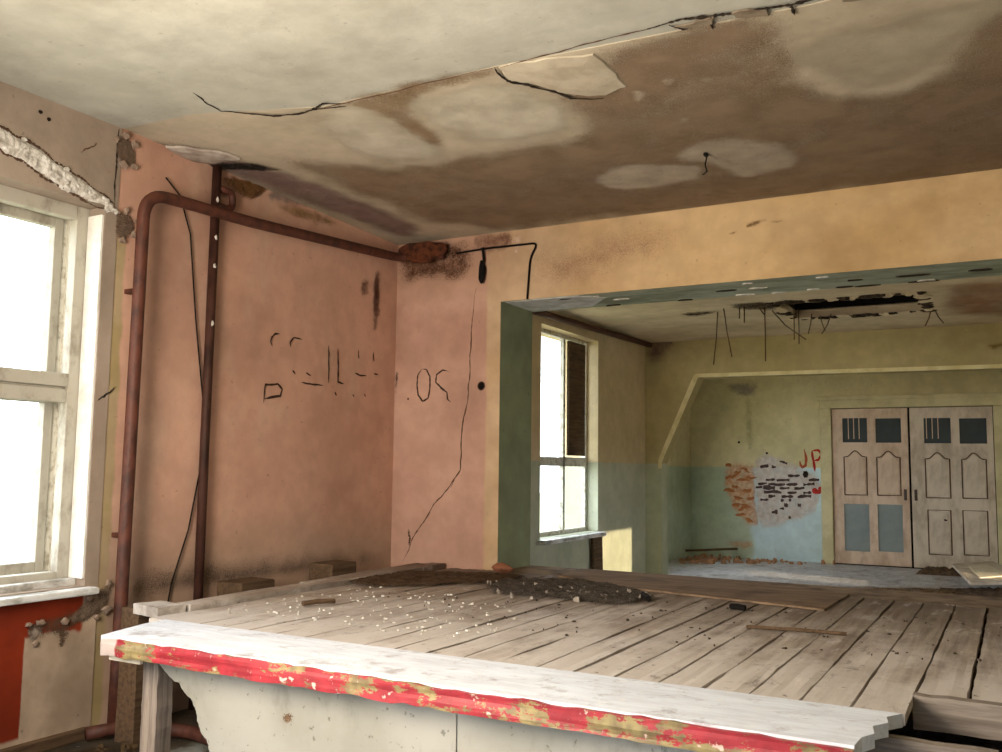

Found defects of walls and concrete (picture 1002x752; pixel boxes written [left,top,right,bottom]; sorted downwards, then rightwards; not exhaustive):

crack [194,0,812,117]
flaking render [495,53,649,103]
damp [207,5,1002,238]
flaking render [0,125,140,243]
flaking render [716,274,940,322]
flaking render [723,452,821,528]